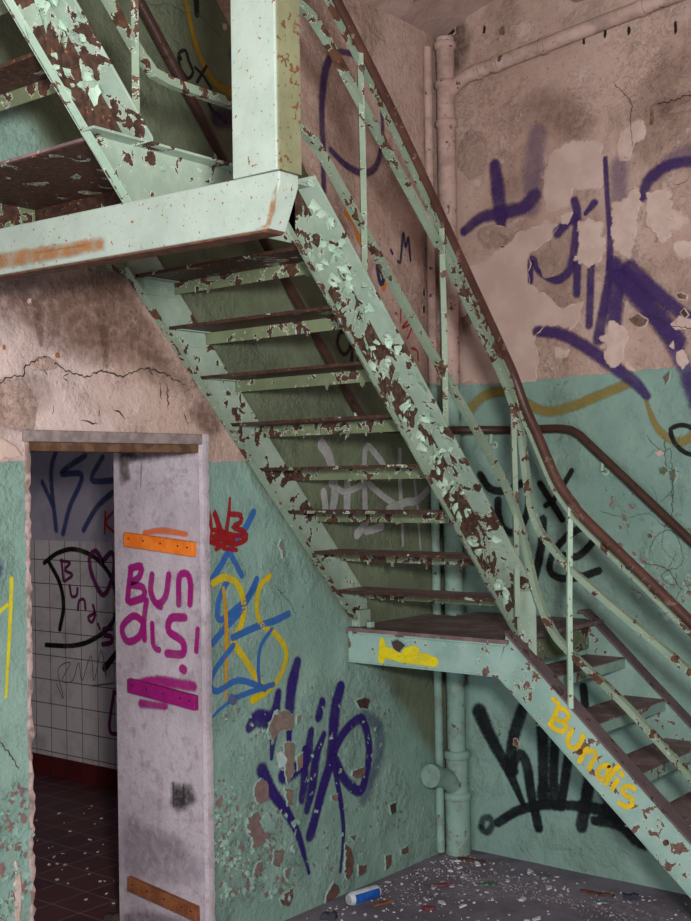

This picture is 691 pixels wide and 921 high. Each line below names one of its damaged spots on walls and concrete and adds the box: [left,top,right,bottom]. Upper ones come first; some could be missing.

peeling [34,0,58,32]
peeling [51,12,101,106]
crack [615,85,633,147]
peeling [616,106,655,162]
peeling [302,199,336,230]
peeling [306,239,355,310]
peeling [469,139,691,386]
crack [0,356,187,386]
peeling [459,296,500,385]
peeling [357,331,512,606]
peeling [0,775,35,921]
peeling [213,702,408,908]